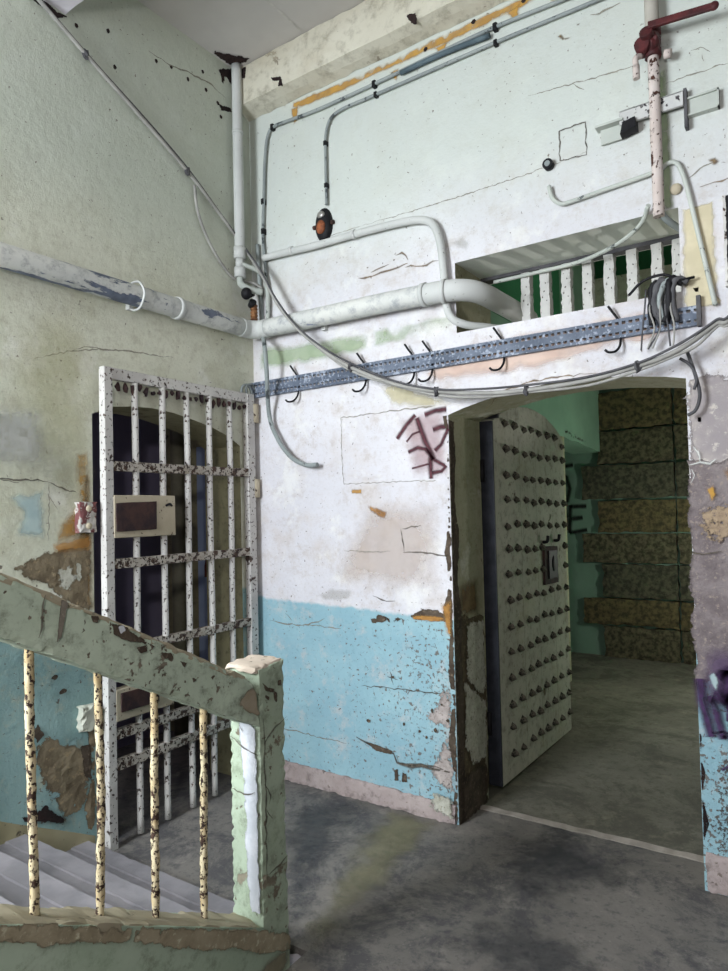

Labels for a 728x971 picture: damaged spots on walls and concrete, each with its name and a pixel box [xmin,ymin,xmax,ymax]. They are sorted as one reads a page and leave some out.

crack [149,51,222,119]
crack [0,478,77,539]
peeling [684,374,728,683]
flaking render [14,537,99,642]
peeling [112,624,187,667]
peeling [371,416,489,825]
flaking render [23,725,96,830]
crack [229,720,450,879]
peeling [0,923,291,954]